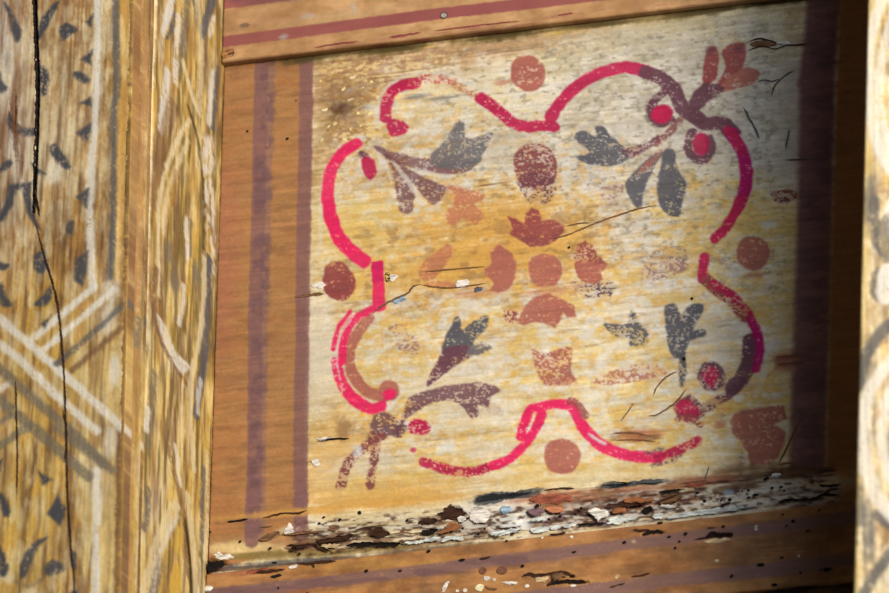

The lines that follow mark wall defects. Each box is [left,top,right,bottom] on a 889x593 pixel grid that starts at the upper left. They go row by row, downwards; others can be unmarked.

peeling [748,38,809,50]
crack [557,206,650,238]
crack [32,0,75,593]
crack [295,290,324,298]
crack [375,266,486,311]
spalling [315,525,354,549]
spalling [369,527,390,537]
flaking render [405,504,575,544]
flaking render [588,494,751,525]